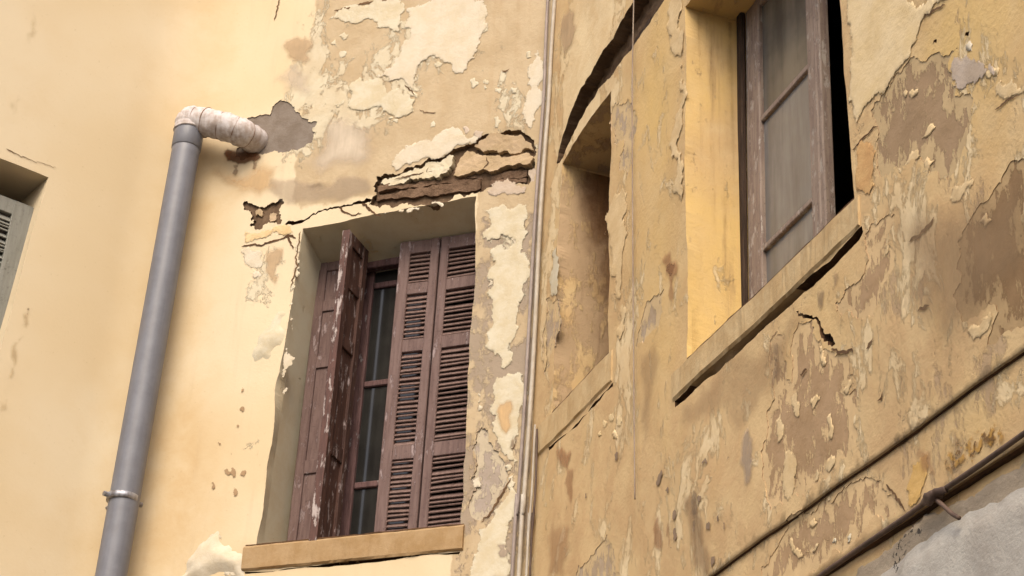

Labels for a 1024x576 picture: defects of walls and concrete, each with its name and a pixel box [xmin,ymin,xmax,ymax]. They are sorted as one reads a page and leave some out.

peeling [392,121,483,171]
peeling [329,0,547,129]
spalling [847,0,1024,203]
spalling [241,199,300,394]
crack [241,198,381,288]
peeling [605,188,628,340]
crack [796,226,873,354]
spalling [953,158,1024,345]
peeling [468,178,530,576]
crack [675,386,697,407]
spalling [761,320,928,576]
flaking render [856,460,1024,576]